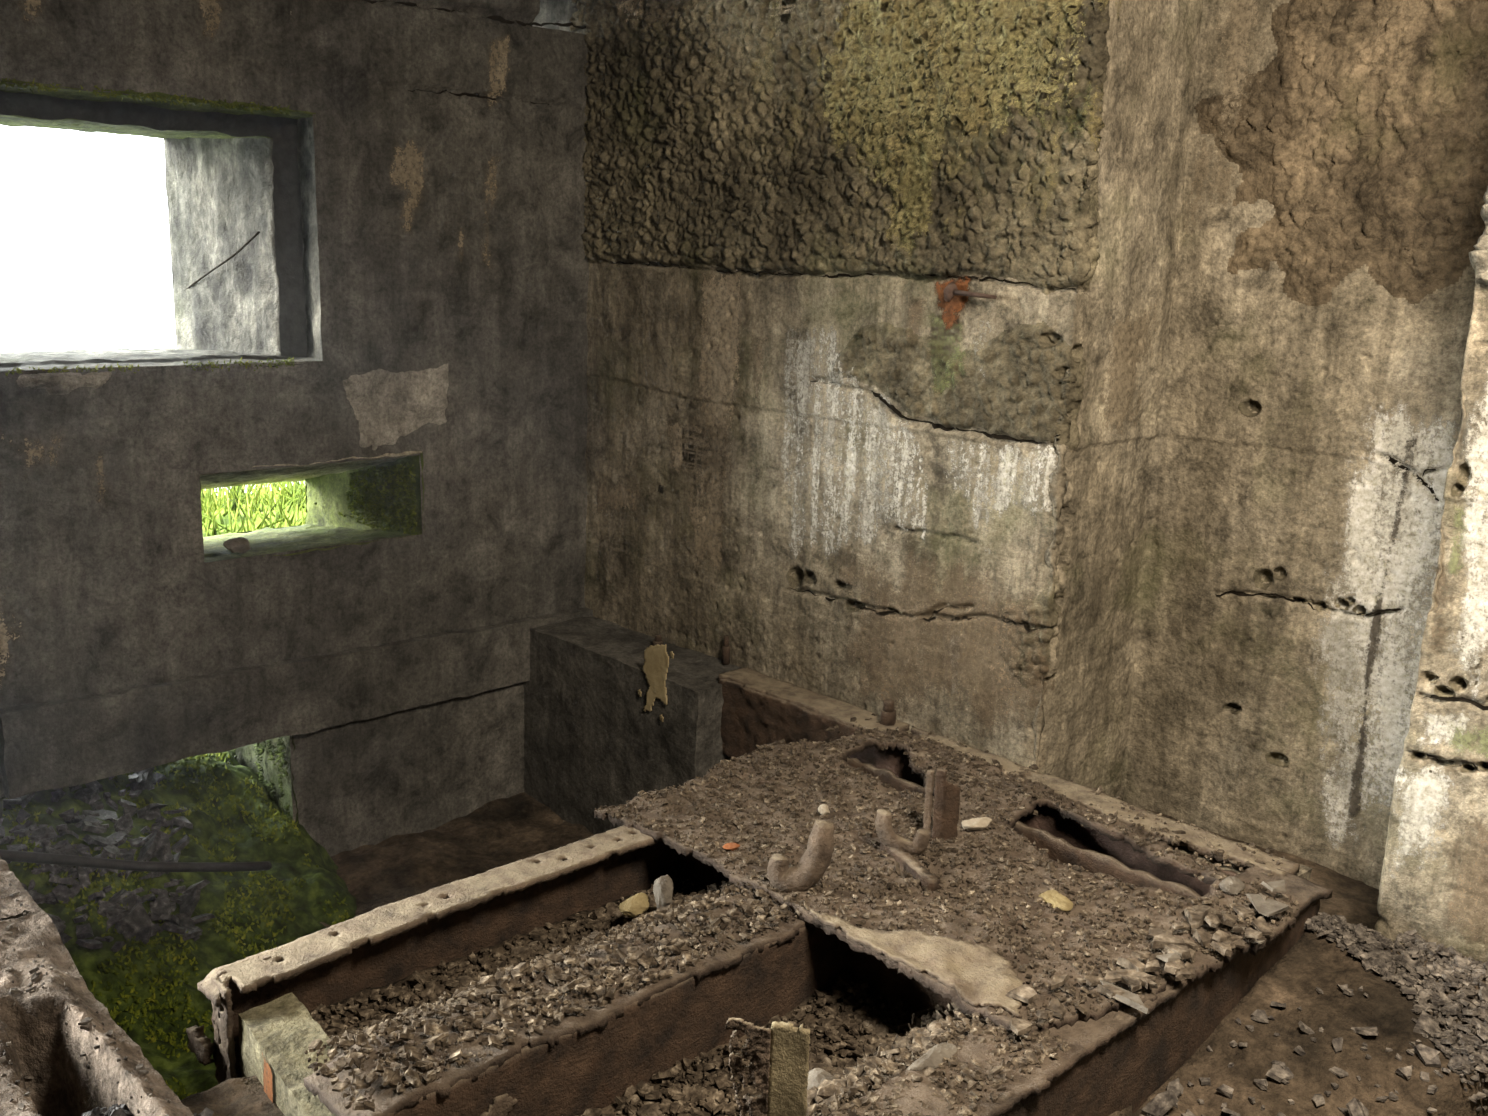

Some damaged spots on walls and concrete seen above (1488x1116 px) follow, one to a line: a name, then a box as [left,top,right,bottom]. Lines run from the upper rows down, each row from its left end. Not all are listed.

crack [608,260,1085,294]
rust [906,276,971,337]
crack [810,380,1052,445]
crack [1384,455,1439,501]
spalling [786,567,865,612]
crack [1216,590,1402,616]
leakage [1311,371,1488,945]
spalling [1422,672,1468,698]